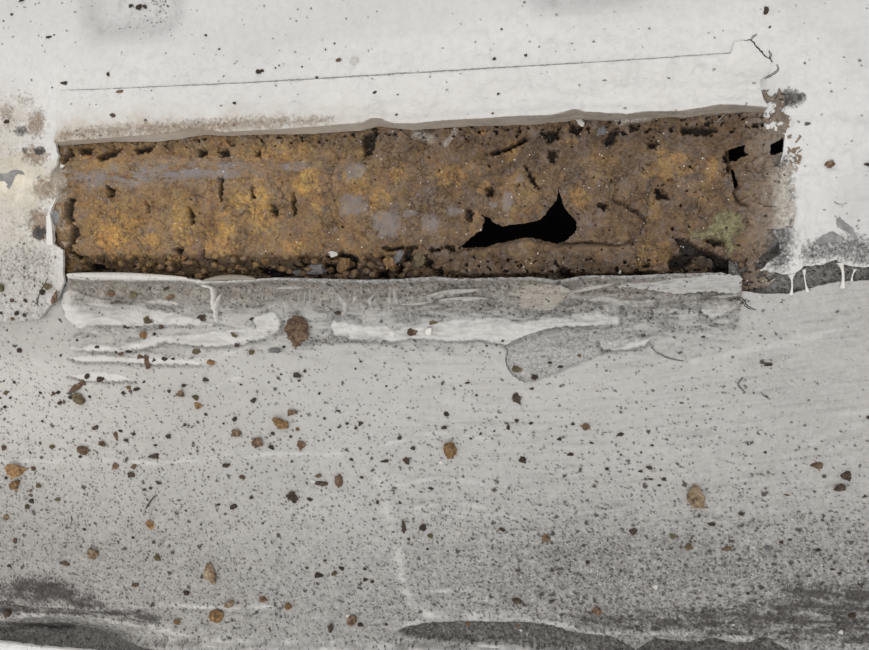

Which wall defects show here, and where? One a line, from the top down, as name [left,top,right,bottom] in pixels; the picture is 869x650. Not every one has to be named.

crack [505,327,557,381]